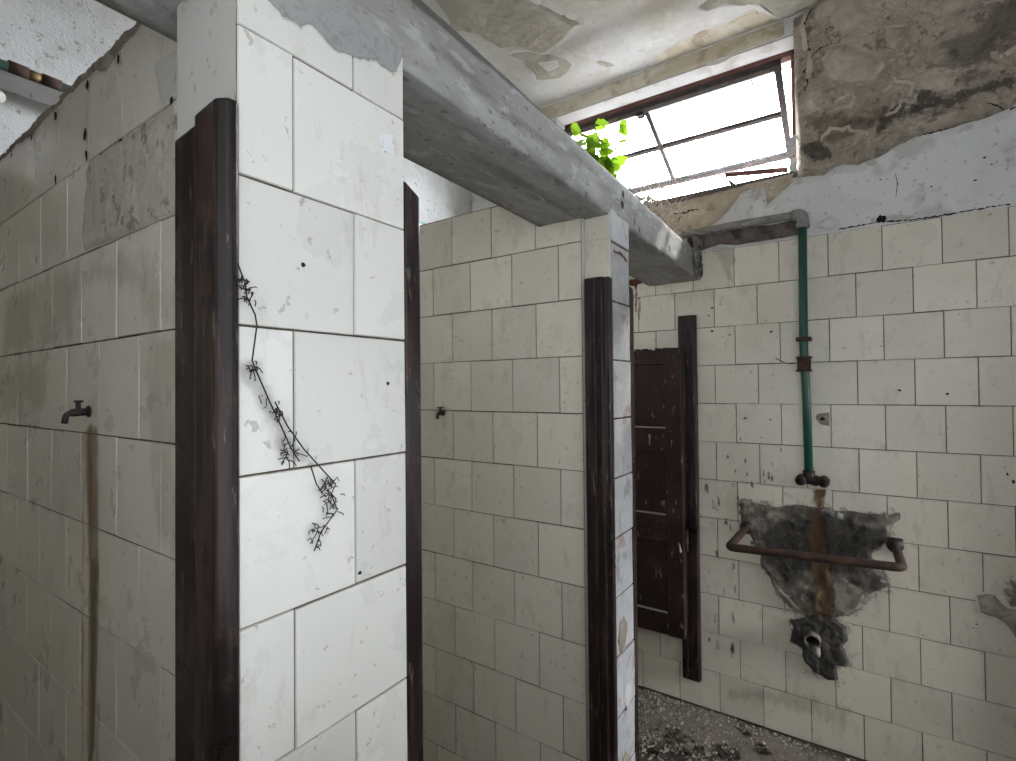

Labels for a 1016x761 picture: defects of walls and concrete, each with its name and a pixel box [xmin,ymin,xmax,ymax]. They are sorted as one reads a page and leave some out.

peeling [430,0,590,80]
peeling [540,0,822,122]
water stain [787,0,1016,186]
corrosion [629,279,642,317]
corrosion [814,490,825,508]
water stain [86,427,97,761]
peeling [738,498,901,680]
spalling [975,580,1016,644]